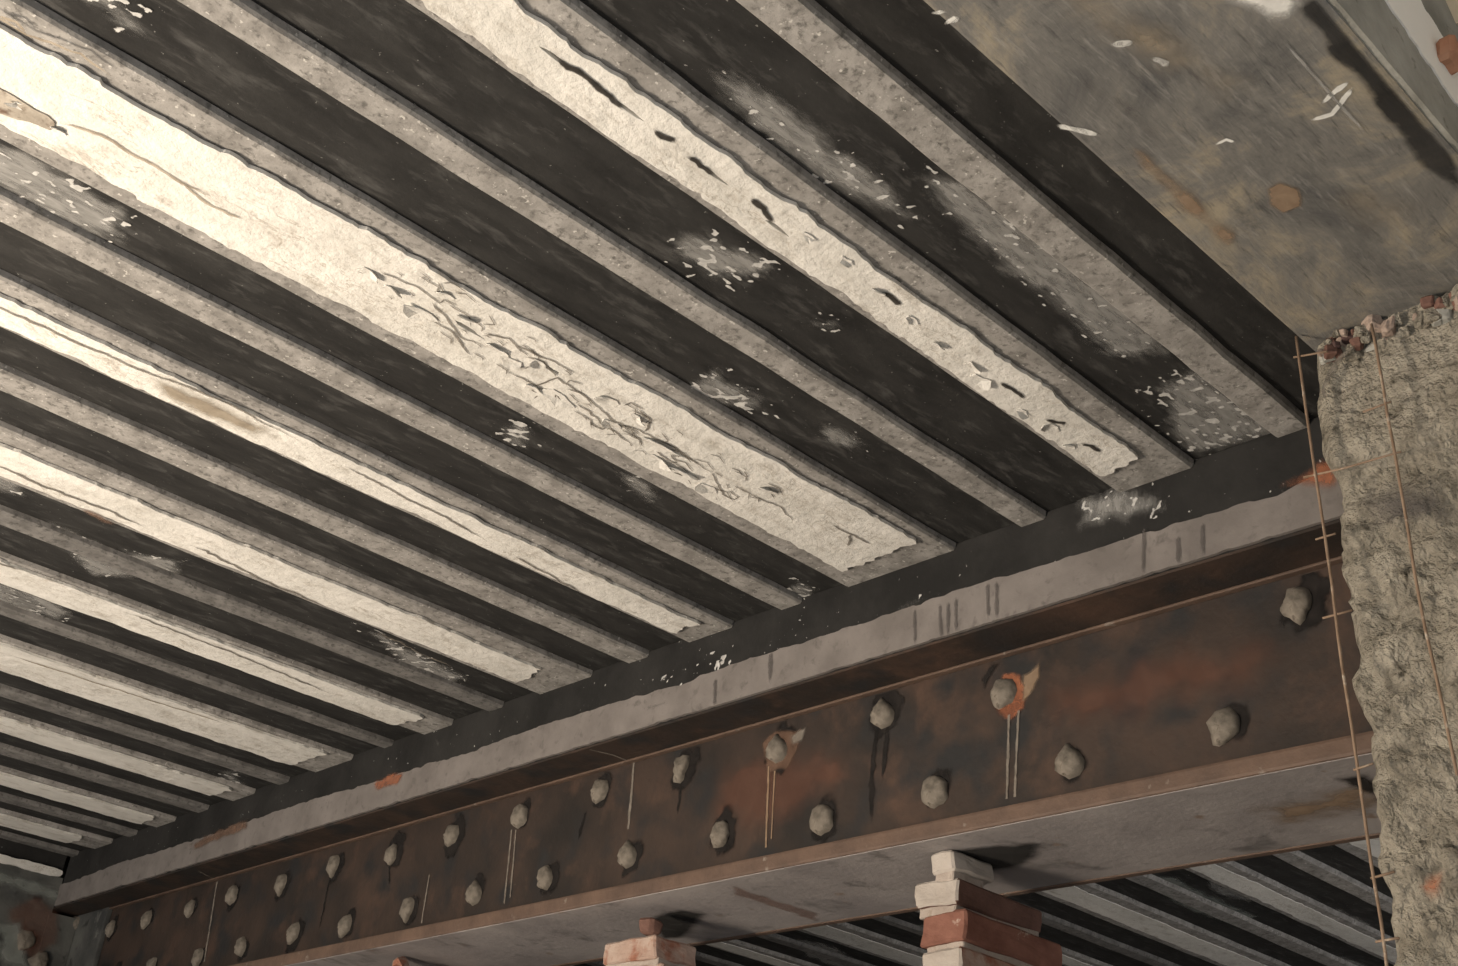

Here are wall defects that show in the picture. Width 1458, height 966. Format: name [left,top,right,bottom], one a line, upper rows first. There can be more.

crack [559,60,622,108]
leakage [0,152,137,243]
crack [69,125,238,218]
crack [654,131,712,175]
crack [751,199,773,222]
crack [884,292,901,305]
crack [0,307,286,434]
crack [360,272,792,519]
crack [1001,383,1101,452]
rust [982,665,1039,799]
rust [375,774,401,789]
rust [763,730,804,848]